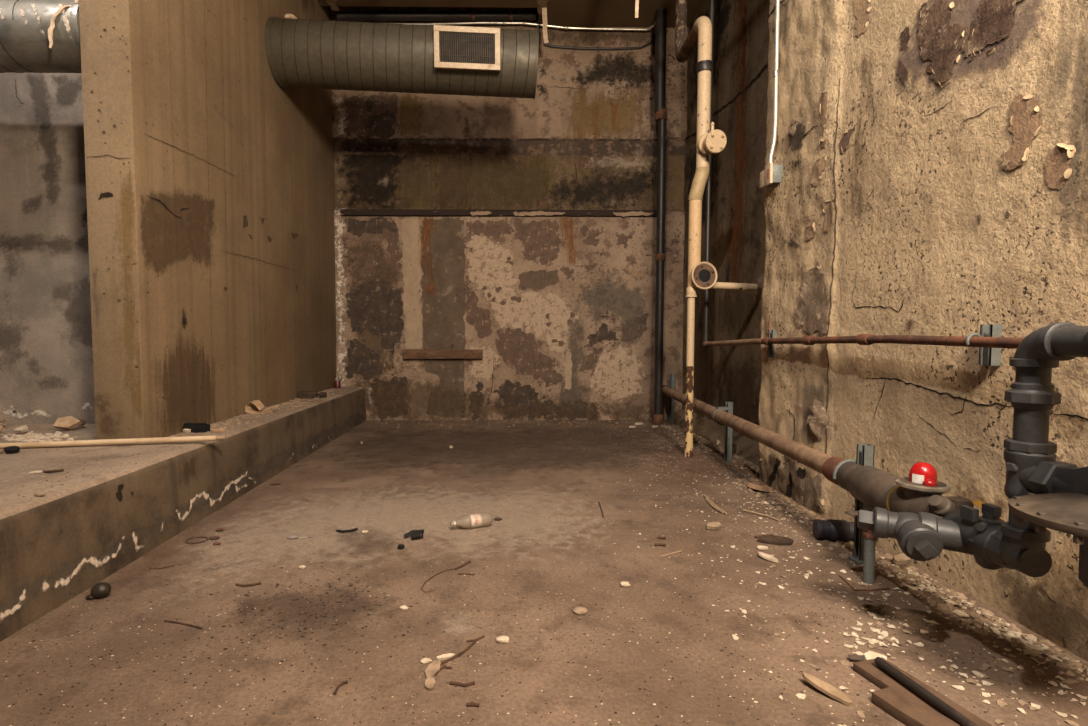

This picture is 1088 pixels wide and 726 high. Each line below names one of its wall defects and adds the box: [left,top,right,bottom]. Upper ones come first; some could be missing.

peeling [853,0,872,37]
spalling [897,0,1021,89]
peeling [1001,94,1044,171]
peeling [1044,143,1076,189]
leakage [0,236,89,251]
leakage [56,279,93,354]
leakage [121,179,214,414]
leakage [157,94,653,531]
spalling [796,261,829,337]
crack [868,377,1012,452]
crack [1052,413,1088,421]
leakage [0,532,145,621]